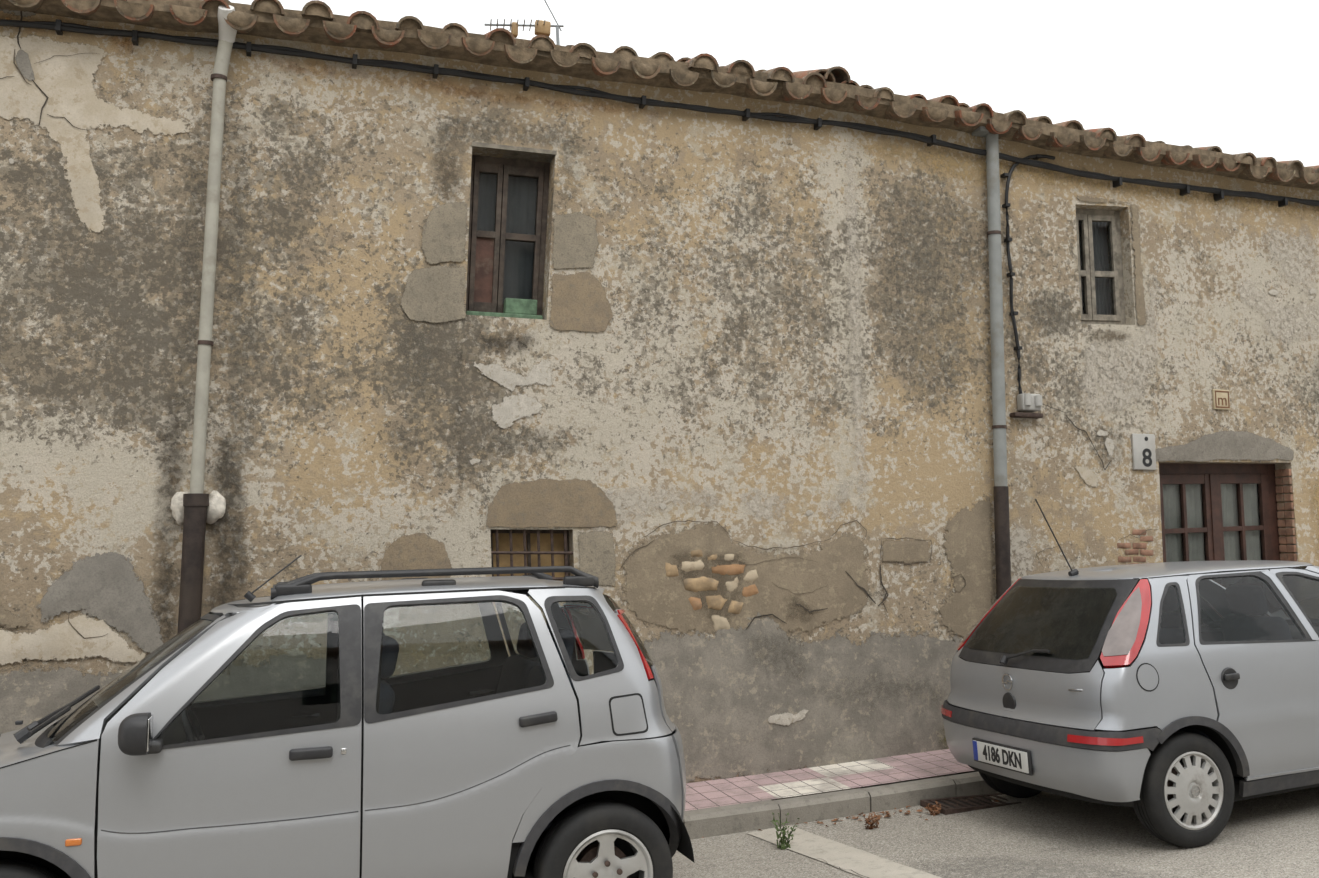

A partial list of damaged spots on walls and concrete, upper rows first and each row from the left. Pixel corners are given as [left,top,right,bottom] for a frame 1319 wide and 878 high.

crack [0,11,97,130]
leakage [865,144,1319,213]
leakage [805,159,866,517]
leakage [1095,331,1127,340]
peeling [0,606,146,665]
leakage [155,560,174,640]
leakage [159,418,182,539]
leakage [210,453,248,608]
peeling [619,496,996,637]
crack [845,565,888,613]